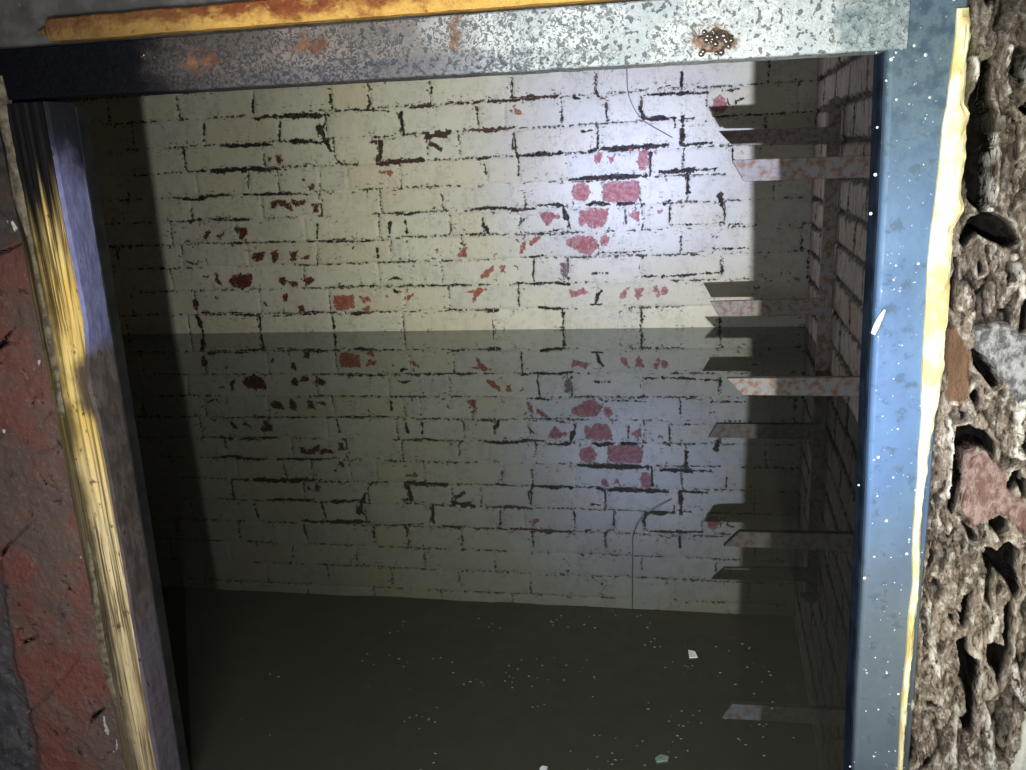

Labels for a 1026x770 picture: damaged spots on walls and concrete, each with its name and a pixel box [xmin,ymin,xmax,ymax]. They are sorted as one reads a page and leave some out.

rust [693,25,737,57]
peeling [270,178,321,214]
peeling [566,148,658,255]
peeling [200,227,248,242]
peeling [203,249,310,300]
peeling [278,276,315,312]
peeling [333,294,371,314]
crack [0,331,12,348]
flaking render [1009,711,1026,770]